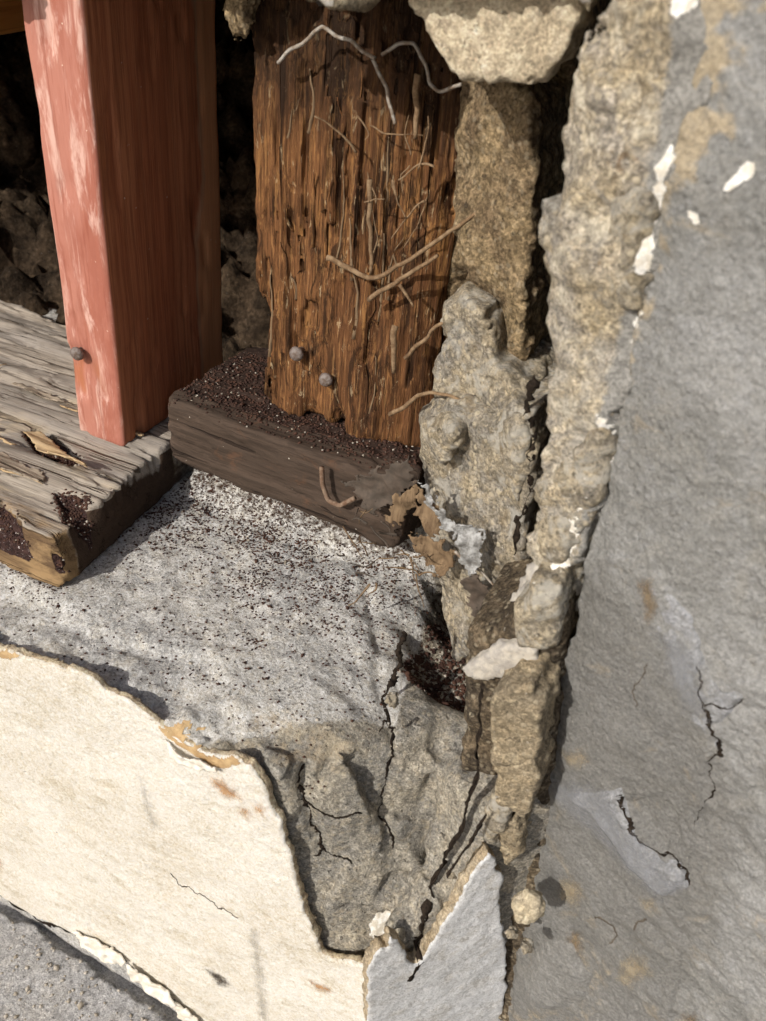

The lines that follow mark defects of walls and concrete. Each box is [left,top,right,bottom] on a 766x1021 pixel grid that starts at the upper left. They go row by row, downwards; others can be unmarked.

peeling [629,230,658,275]
peeling [569,507,583,549]
spalling [462,638,539,681]
crack [296,631,408,864]
crack [694,666,743,824]
spalling [150,699,550,957]
crack [407,680,487,982]
crack [615,794,690,885]